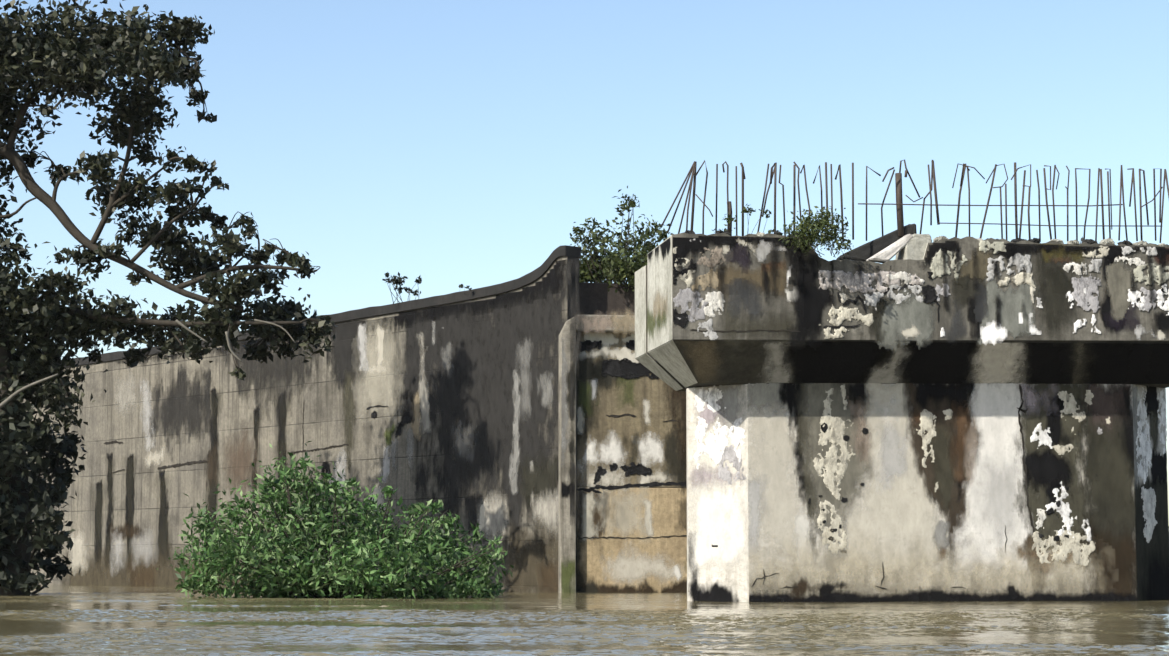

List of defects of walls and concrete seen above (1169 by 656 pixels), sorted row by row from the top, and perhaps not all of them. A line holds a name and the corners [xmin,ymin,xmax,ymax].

peeling [661,160,1169,340]
leakage [207,388,218,460]
leakage [411,379,430,438]
peeling [694,385,746,485]
leakage [465,238,1074,597]
peeling [808,384,868,555]
peeling [916,409,953,468]
peeling [1030,390,1094,457]
leakage [205,478,217,559]
peeling [1032,481,1095,569]